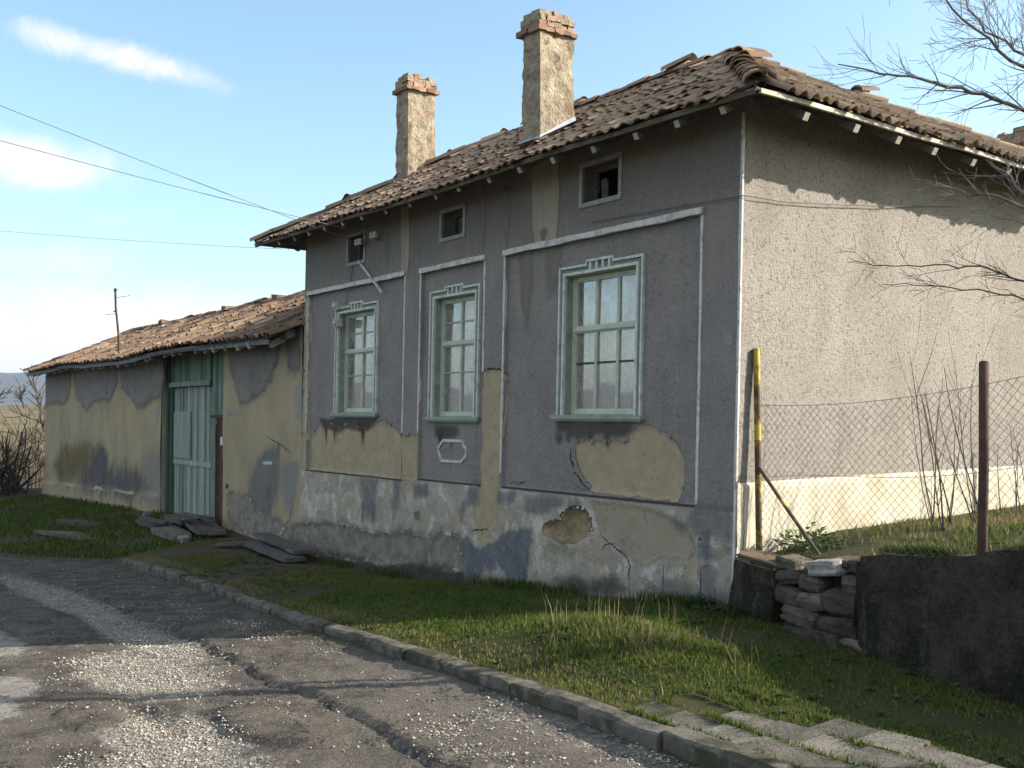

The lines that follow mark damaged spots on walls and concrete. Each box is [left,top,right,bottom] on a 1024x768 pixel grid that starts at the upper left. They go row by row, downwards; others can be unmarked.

peeling [46,356,164,411]
peeling [229,297,418,482]
leakage [57,447,159,501]
leakage [251,453,297,511]
peeling [474,367,509,548]
crack [570,449,589,490]
peeling [567,425,685,503]
flaking render [542,505,593,546]
leakage [311,529,532,584]
crack [602,536,631,585]